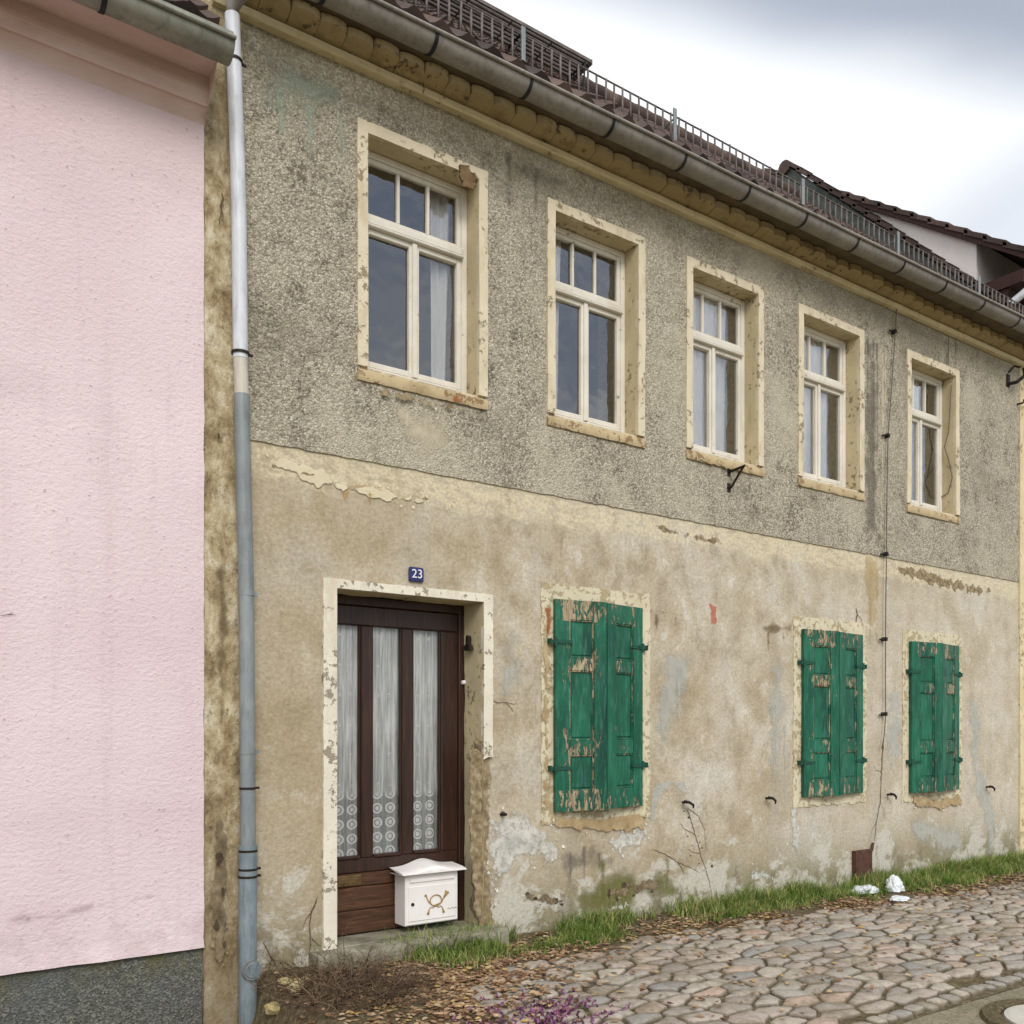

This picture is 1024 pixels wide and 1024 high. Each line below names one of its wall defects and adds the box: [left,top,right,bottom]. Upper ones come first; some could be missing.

peeling [265,453,428,509]
flaking render [657,524,722,543]
flaking render [895,563,991,596]
flaking render [468,635,688,926]